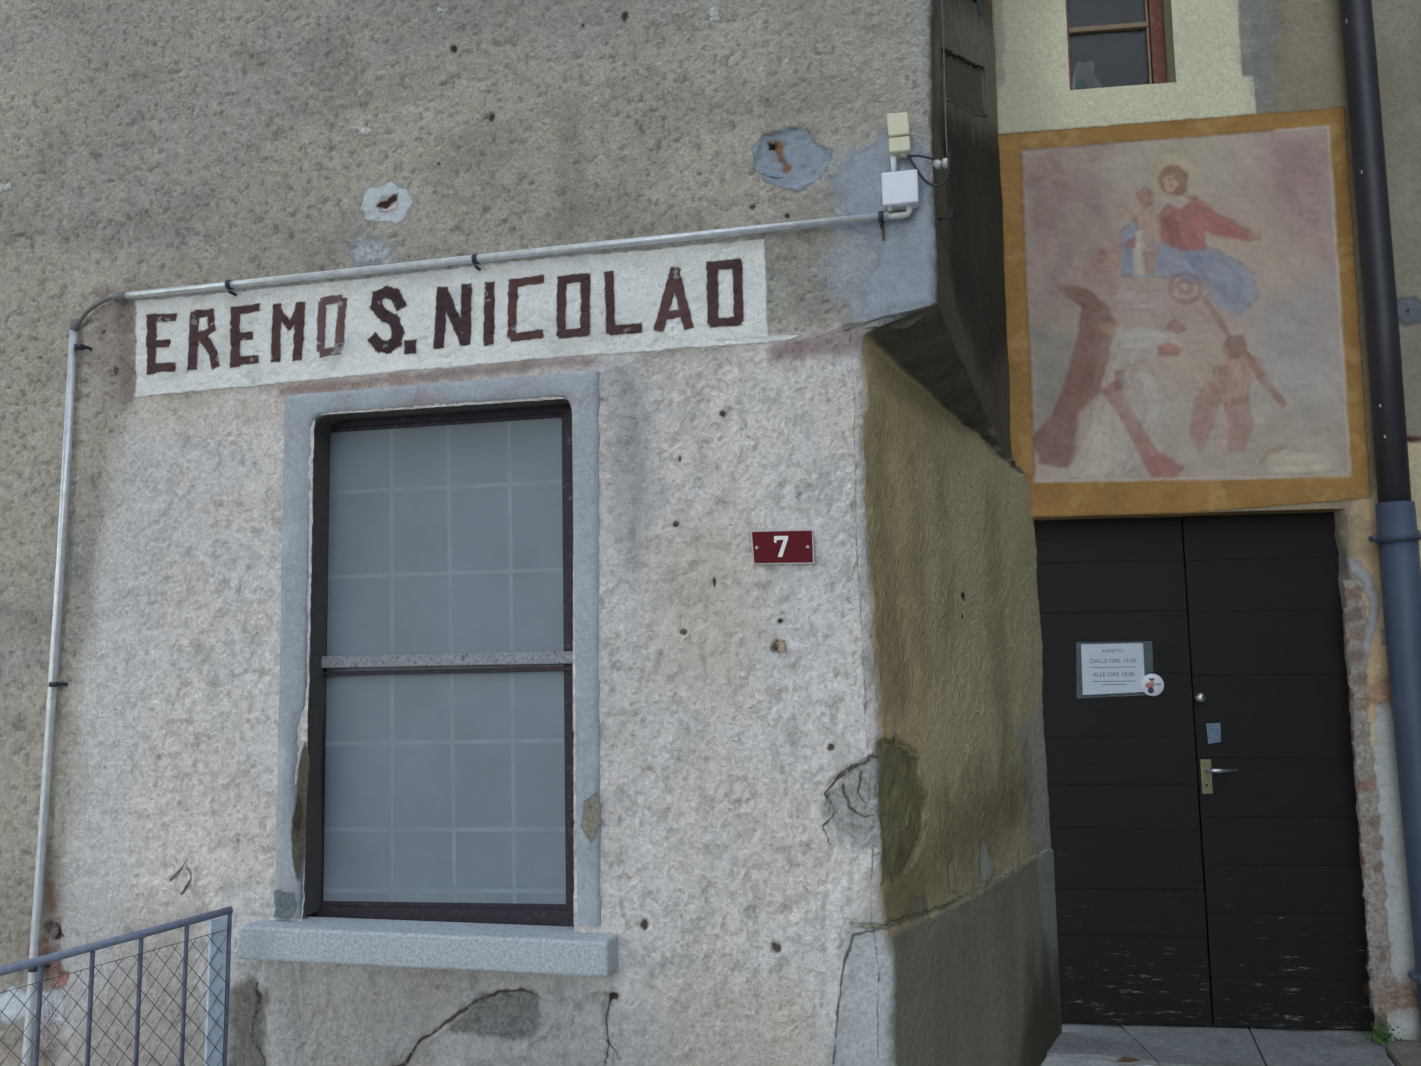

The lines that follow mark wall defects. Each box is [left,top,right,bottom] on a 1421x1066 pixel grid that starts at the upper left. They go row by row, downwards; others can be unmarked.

spalling [751,126,833,191]
peeling [360,182,413,224]
spalling [274,742,310,918]
spalling [581,793,601,842]
flaking render [827,757,880,848]
flaking render [1343,559,1418,1015]
crack [251,982,265,1066]
crack [396,988,536,1066]